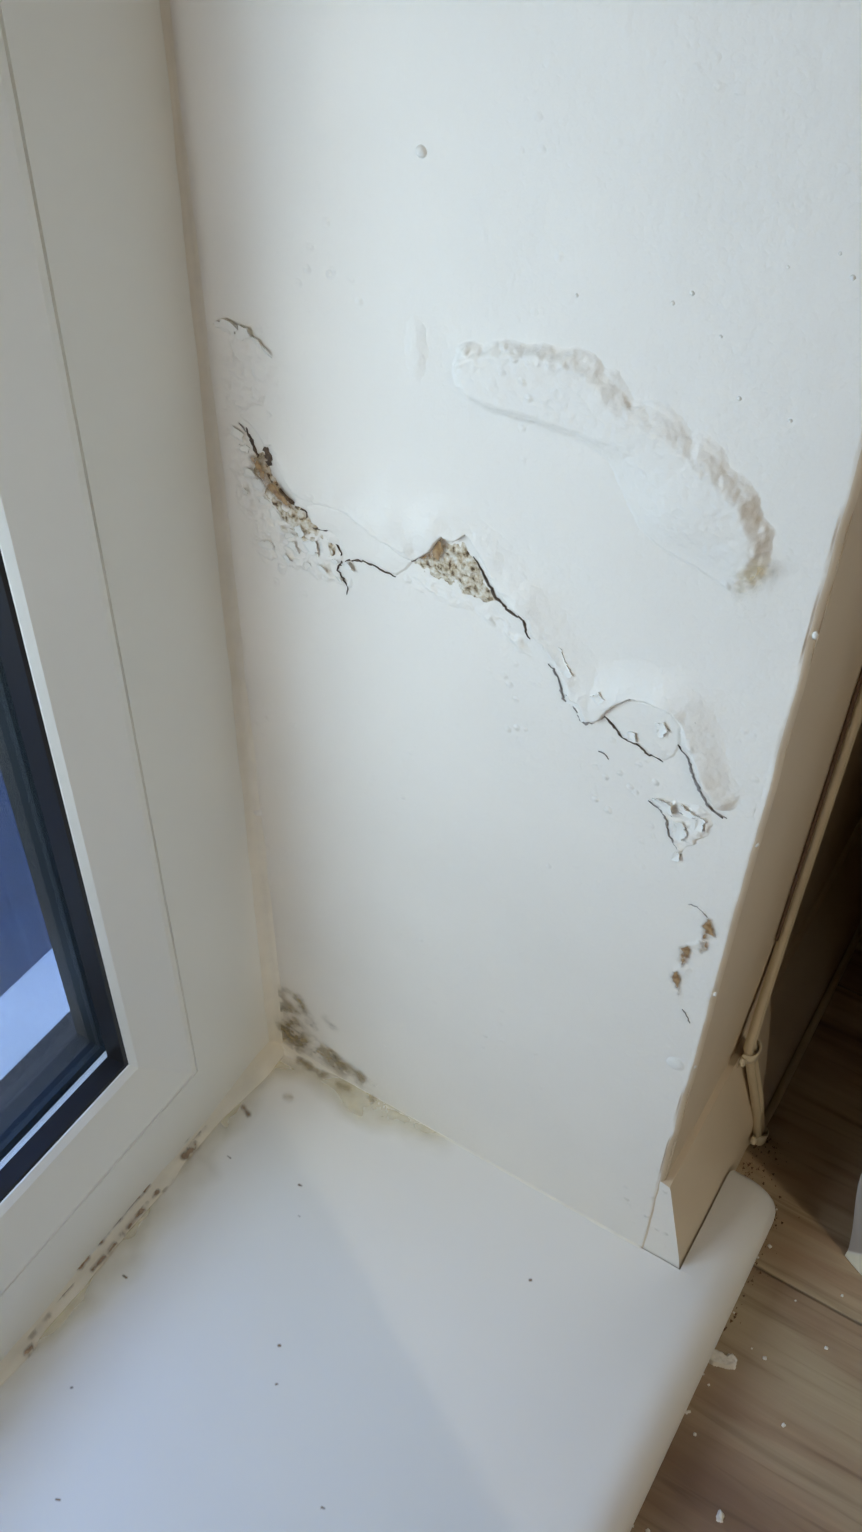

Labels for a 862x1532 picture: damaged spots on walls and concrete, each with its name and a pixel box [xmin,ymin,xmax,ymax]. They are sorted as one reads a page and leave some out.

crack [239,423,421,595]
peeling [222,400,757,862]
crack [473,556,727,819]
damp [280,998,363,1079]